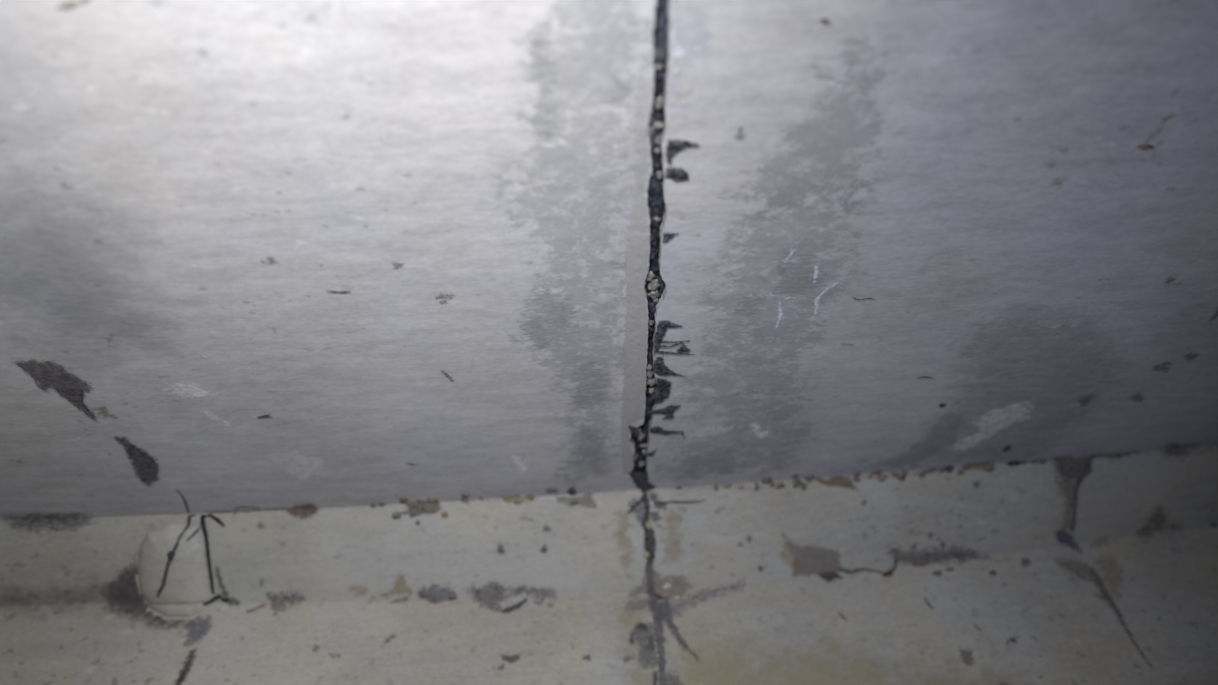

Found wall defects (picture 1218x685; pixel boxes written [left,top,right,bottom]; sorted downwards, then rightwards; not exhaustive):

water stain [813,265,839,314]
crack [628,0,705,685]
spalling [14,360,117,420]
spalling [115,436,159,485]
spalling [781,533,842,582]
crack [1056,559,1152,669]
crack [175,649,196,685]